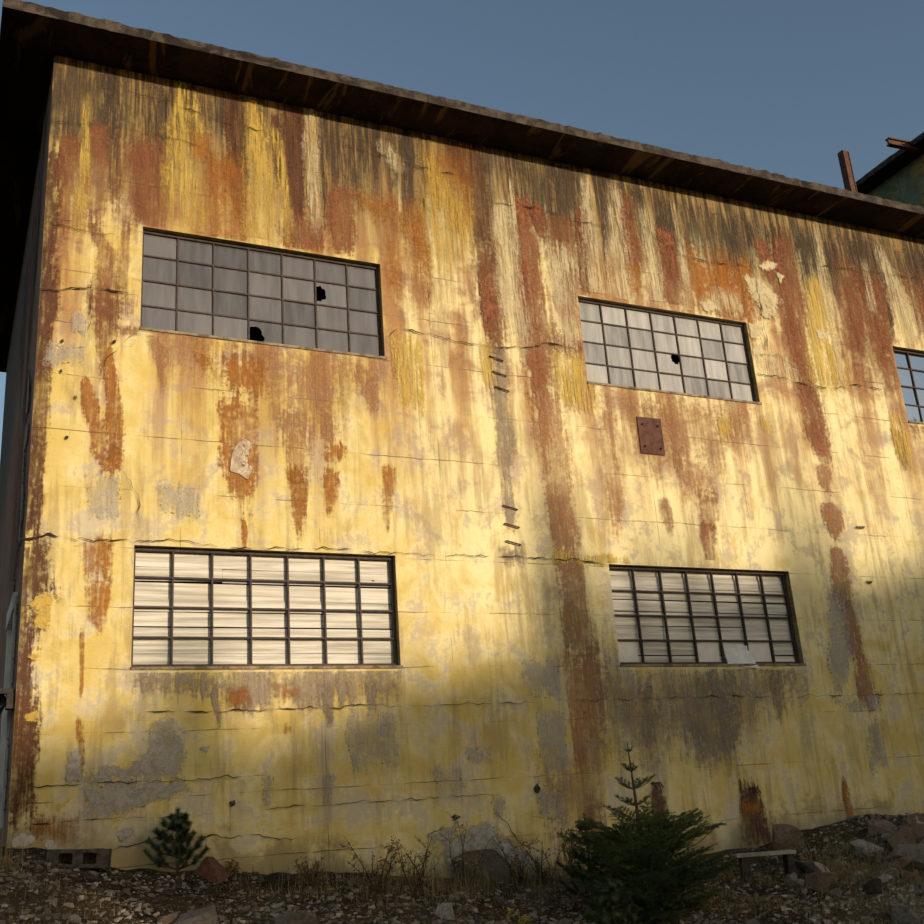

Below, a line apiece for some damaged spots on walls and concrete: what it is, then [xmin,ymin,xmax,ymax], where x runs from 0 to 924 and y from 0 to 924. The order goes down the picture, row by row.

rust [56,122,171,481]
leakage [8,55,416,830]
spalling [230,438,252,479]
rust [184,335,384,533]
leakage [503,484,515,524]
rust [509,195,609,773]
leakage [426,140,924,469]
rust [755,233,833,491]
peeling [65,718,191,819]
crack [11,775,260,788]
crack [266,793,521,849]
leakage [601,661,805,777]